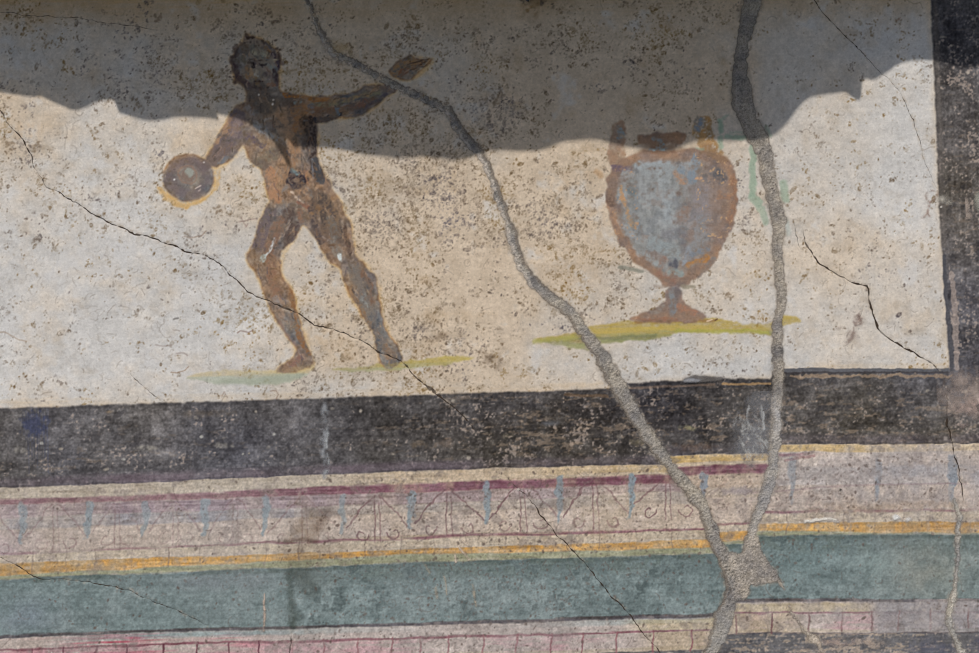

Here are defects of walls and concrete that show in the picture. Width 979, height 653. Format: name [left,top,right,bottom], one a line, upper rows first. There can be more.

crack [306,0,936,653]
crack [81,581,197,620]
crack [945,393,966,653]